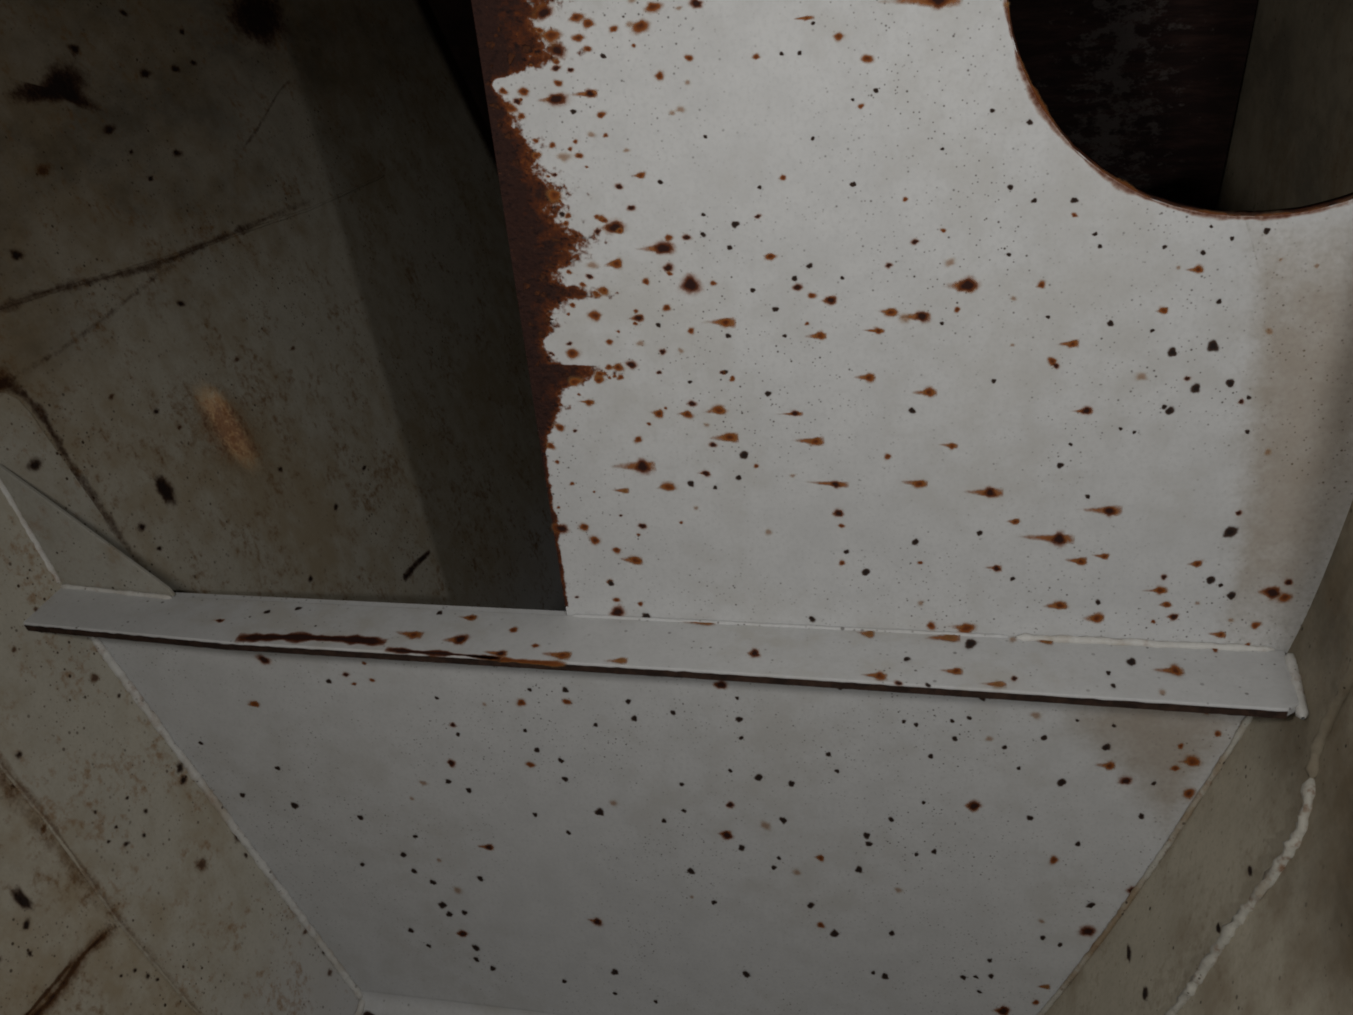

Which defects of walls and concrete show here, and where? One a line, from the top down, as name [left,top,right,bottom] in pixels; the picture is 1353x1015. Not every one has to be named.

corrosion [610,3,661,33]
corrosion [535,5,597,105]
corrosion [570,361,637,386]
corrosion [610,598,643,616]
corrosion [1047,601,1067,609]
corrosion [1087,613,1104,623]
corrosion [1150,575,1178,624]
corrosion [236,615,571,666]
corrosion [927,622,975,642]
corrosion [1156,664,1184,676]
corrosion [1099,762,1132,784]
crack [25,926,116,1015]